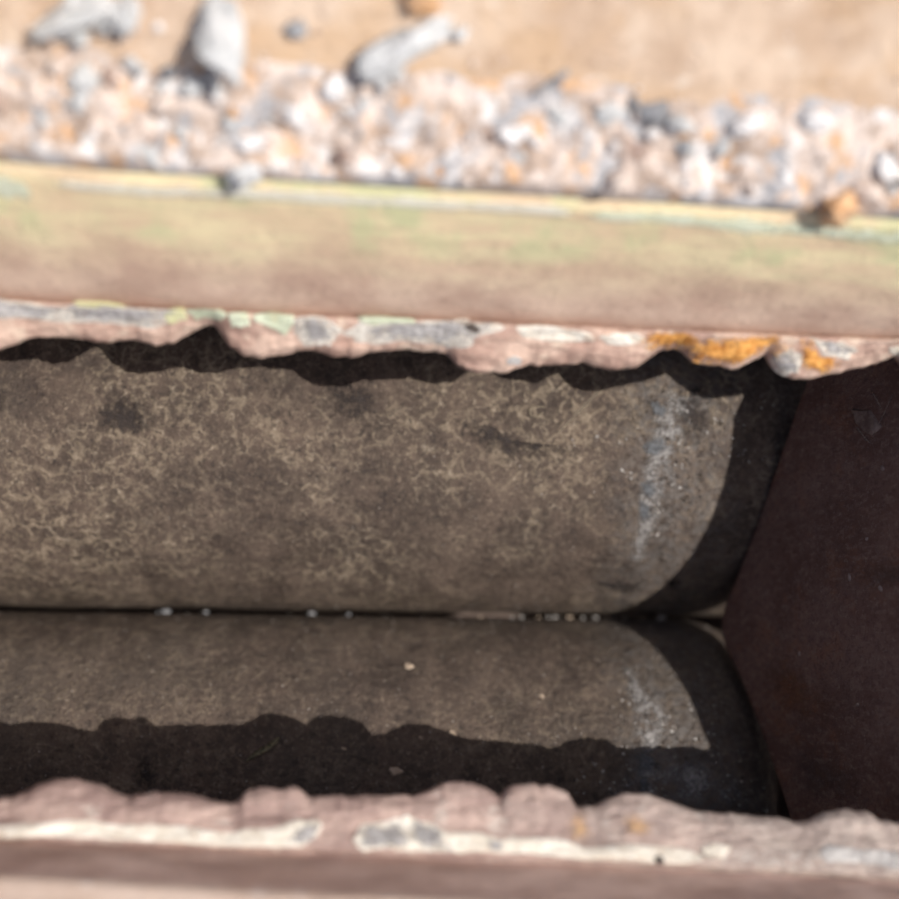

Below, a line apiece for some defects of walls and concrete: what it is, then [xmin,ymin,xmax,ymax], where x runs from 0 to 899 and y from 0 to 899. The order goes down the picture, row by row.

peeling [0,298,646,348]
rust [642,333,787,365]
peeling [769,348,803,376]
rust [801,341,838,373]
peeling [810,338,859,360]
peeling [0,819,322,848]
peeling [353,815,899,870]